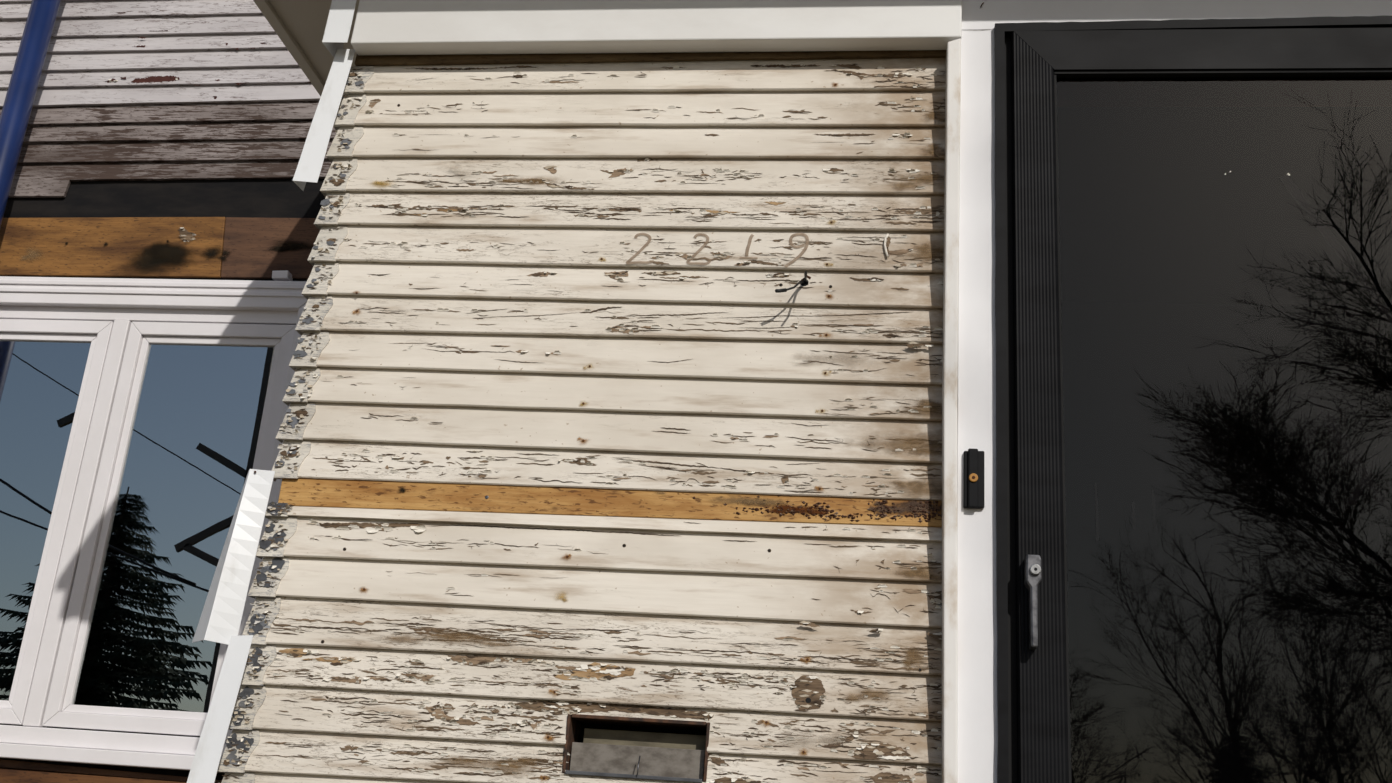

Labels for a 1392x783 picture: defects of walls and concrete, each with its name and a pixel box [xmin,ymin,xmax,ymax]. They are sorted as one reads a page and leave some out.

peeling [751,64,912,79]
peeling [601,158,653,178]
peeling [275,68,381,471]
peeling [604,252,709,282]
peeling [710,252,789,278]
peeling [222,502,435,783]
peeling [446,655,635,681]
peeling [790,675,827,711]
peeling [428,710,481,725]
peeling [507,700,714,726]
peeling [706,754,761,783]
peeling [817,733,914,783]